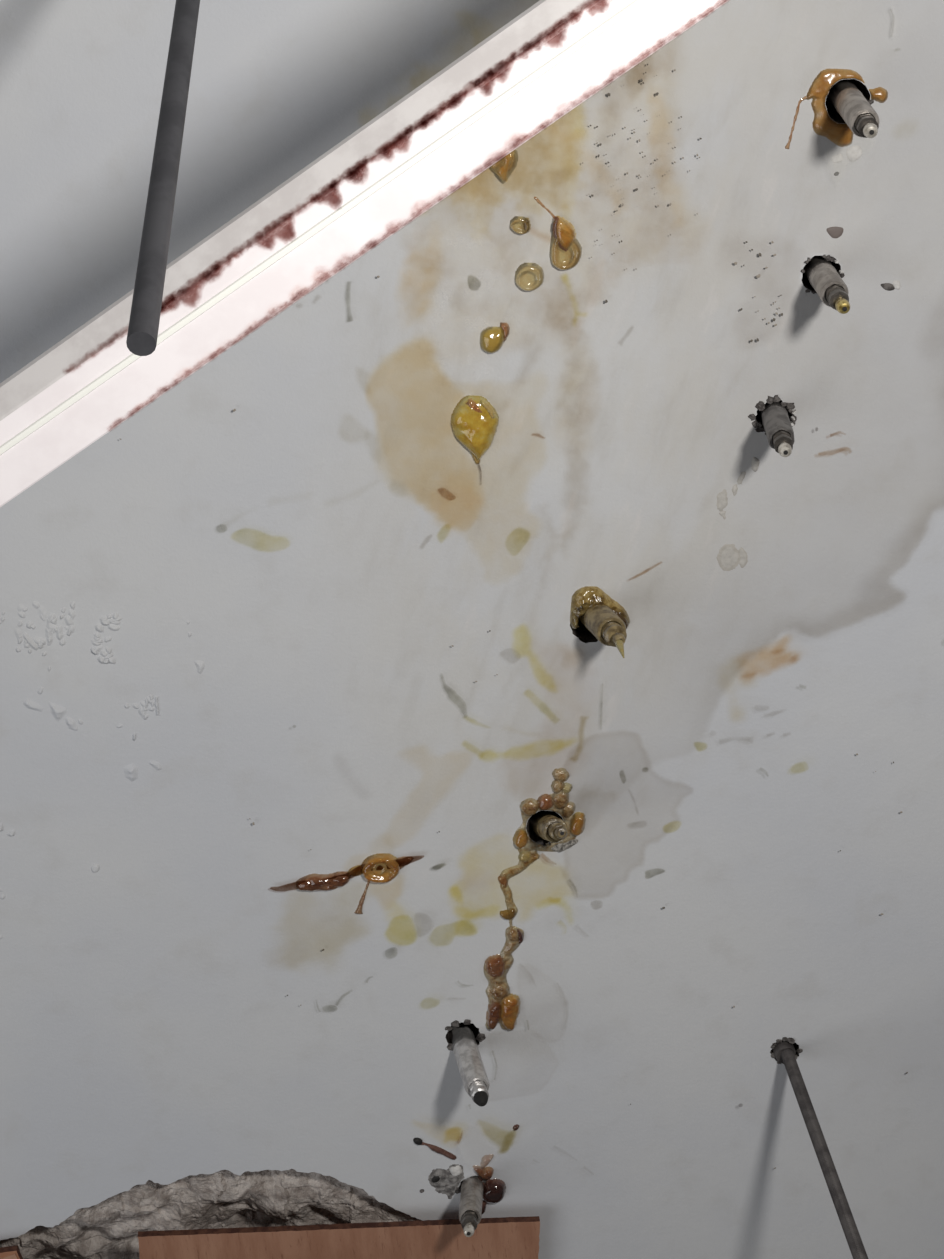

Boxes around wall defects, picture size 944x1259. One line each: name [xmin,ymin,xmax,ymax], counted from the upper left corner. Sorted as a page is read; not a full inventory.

corrosion [161,0,606,312]
leakage [590,107,702,212]
spalling [0,1169,420,1259]